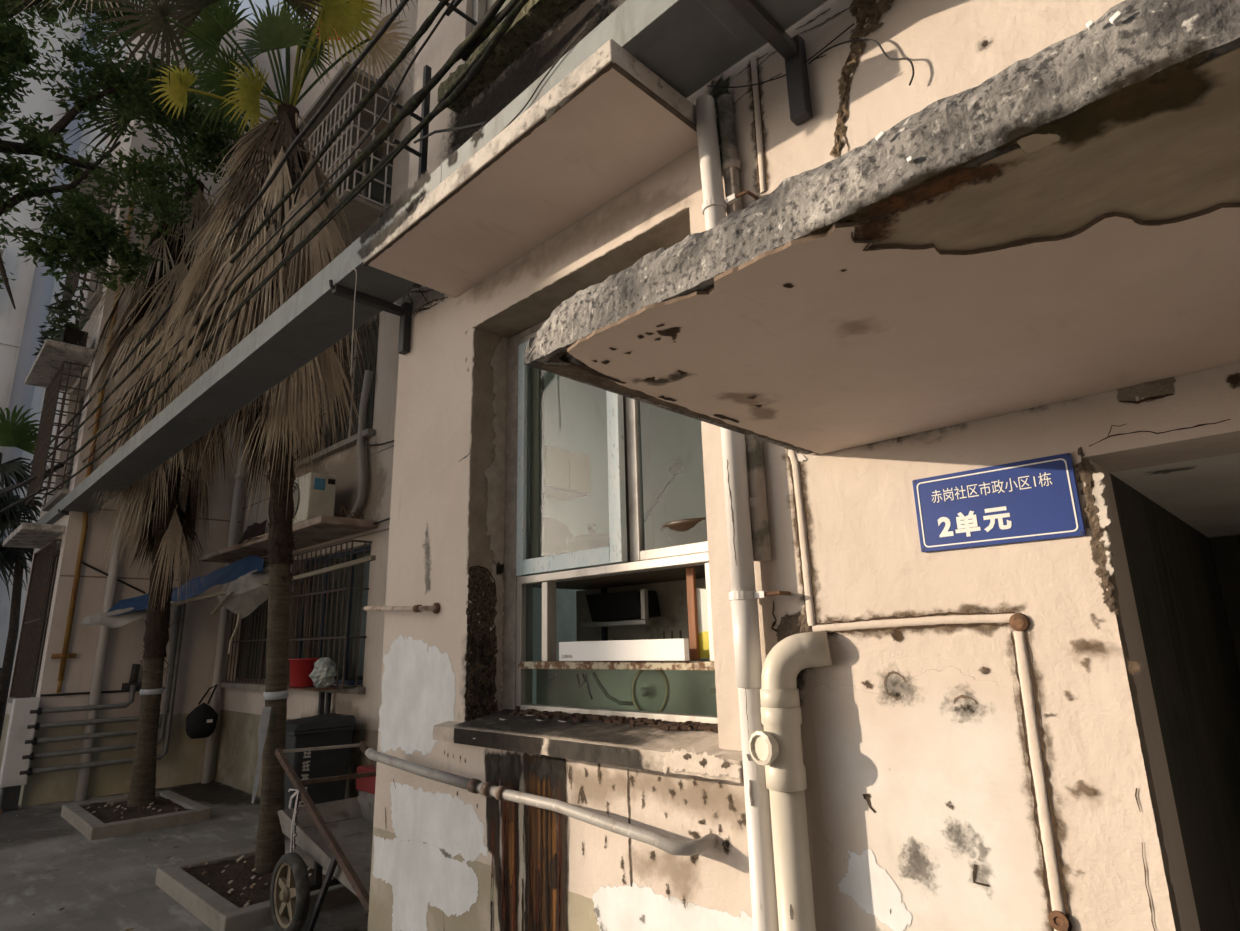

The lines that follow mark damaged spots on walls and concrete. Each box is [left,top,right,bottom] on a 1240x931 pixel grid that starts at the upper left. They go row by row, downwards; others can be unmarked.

flaking render [795,0,894,158]
peeling [800,42,1240,251]
spalling [540,348,815,474]
crack [1089,419,1231,447]
peeling [1074,447,1181,931]
damp [568,763,707,887]
damp [688,820,731,855]
damp [719,783,746,825]